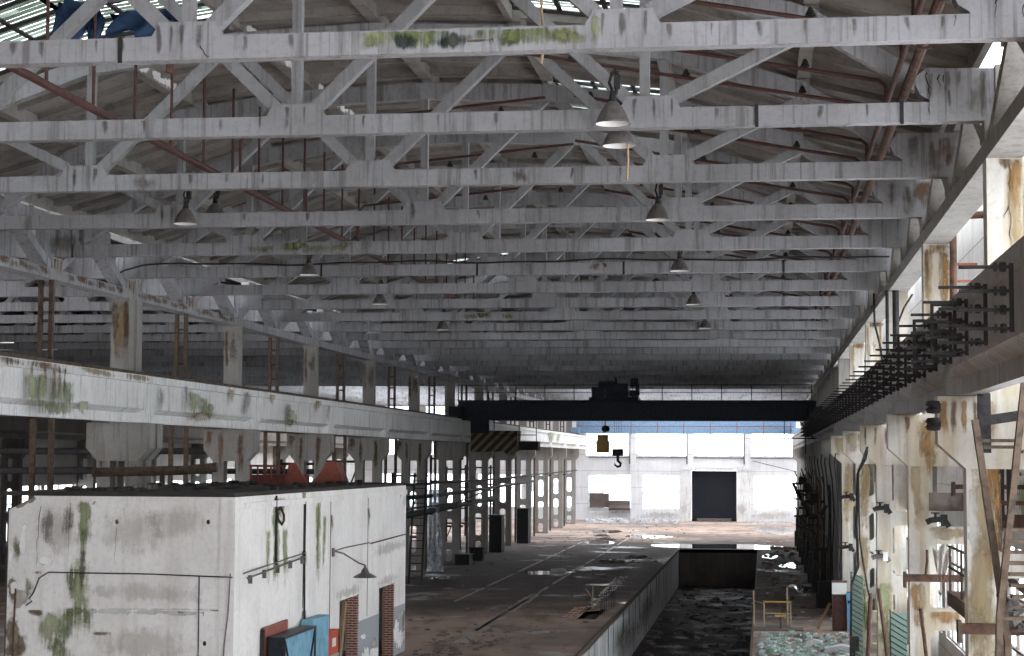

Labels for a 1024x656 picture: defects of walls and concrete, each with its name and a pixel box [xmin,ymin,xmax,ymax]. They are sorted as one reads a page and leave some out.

damp [366,31,448,47]
damp [477,28,579,42]
corrosion [999,159,1022,241]
corrosion [0,255,235,365]
corrosion [924,245,949,313]
damp [27,375,88,413]
damp [184,388,214,420]
corrosion [905,401,977,514]
damp [266,498,287,570]
damp [316,503,326,569]
damp [39,503,204,649]
corrosion [911,584,959,624]